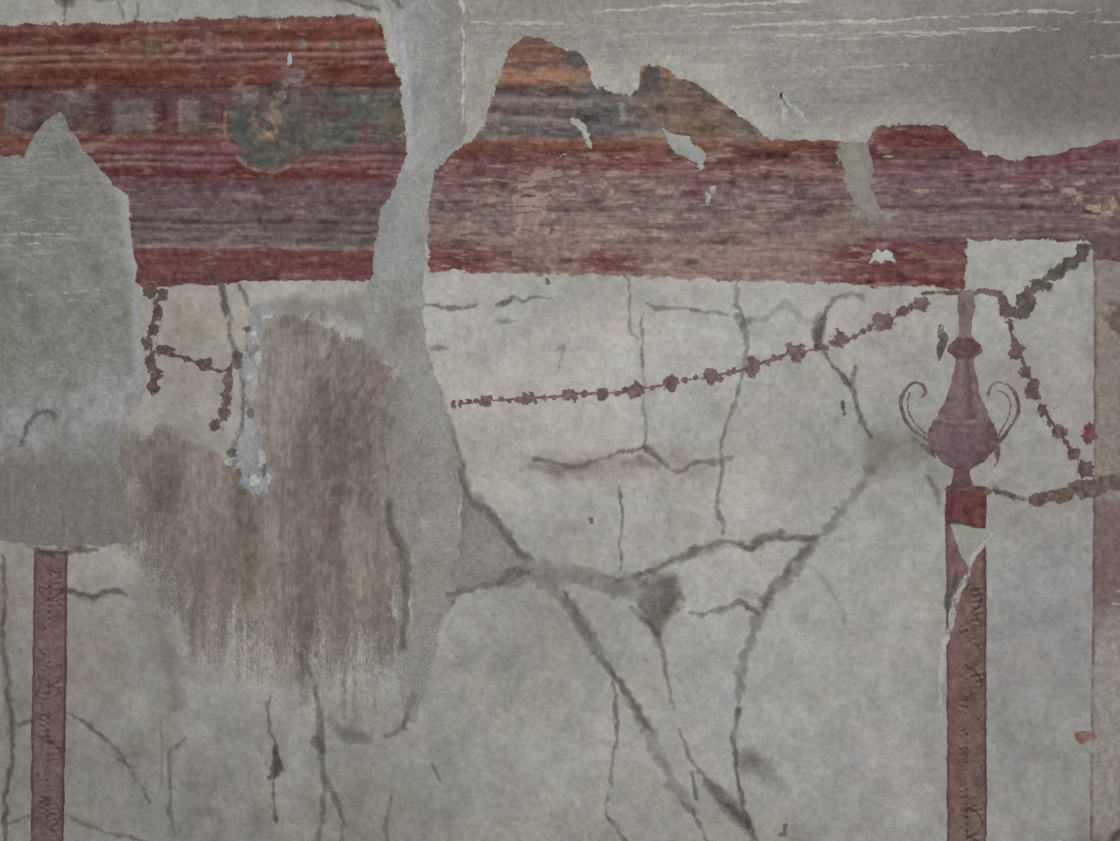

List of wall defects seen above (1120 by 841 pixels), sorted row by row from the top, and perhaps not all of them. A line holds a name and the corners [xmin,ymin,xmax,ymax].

peeling [508,149,590,239]
peeling [570,117,592,149]
peeling [662,128,706,170]
peeling [836,141,898,222]
peeling [1040,179,1119,219]
crack [62,588,126,599]
crack [387,502,407,650]
crack [444,295,872,839]
peeling [938,520,994,721]
crack [0,559,32,840]
crack [267,710,281,822]
crack [312,690,344,839]